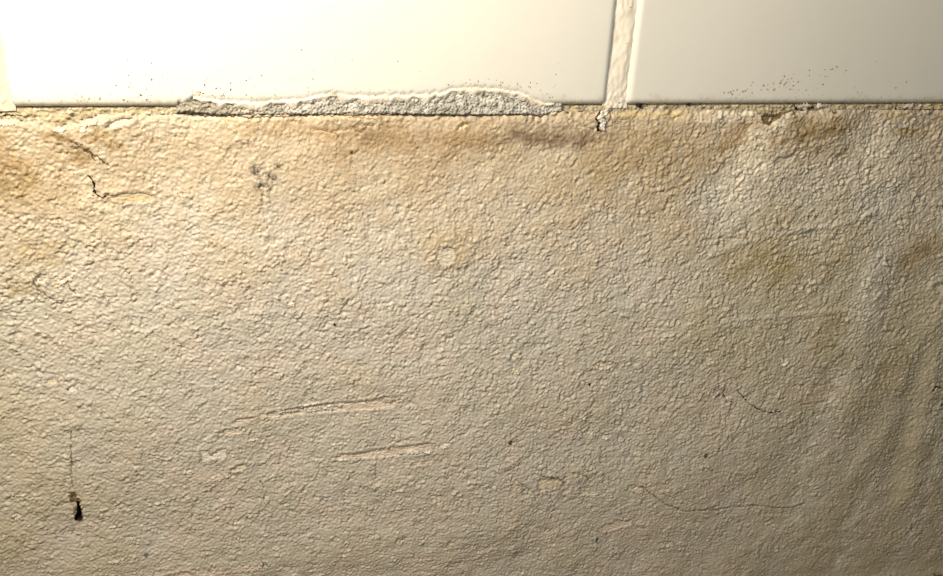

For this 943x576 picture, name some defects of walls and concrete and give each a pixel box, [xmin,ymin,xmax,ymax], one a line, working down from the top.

spalling [176,87,562,130]
crack [70,140,109,198]
damp [0,119,110,319]
damp [182,66,943,576]
crack [723,388,827,413]
crack [631,485,806,512]